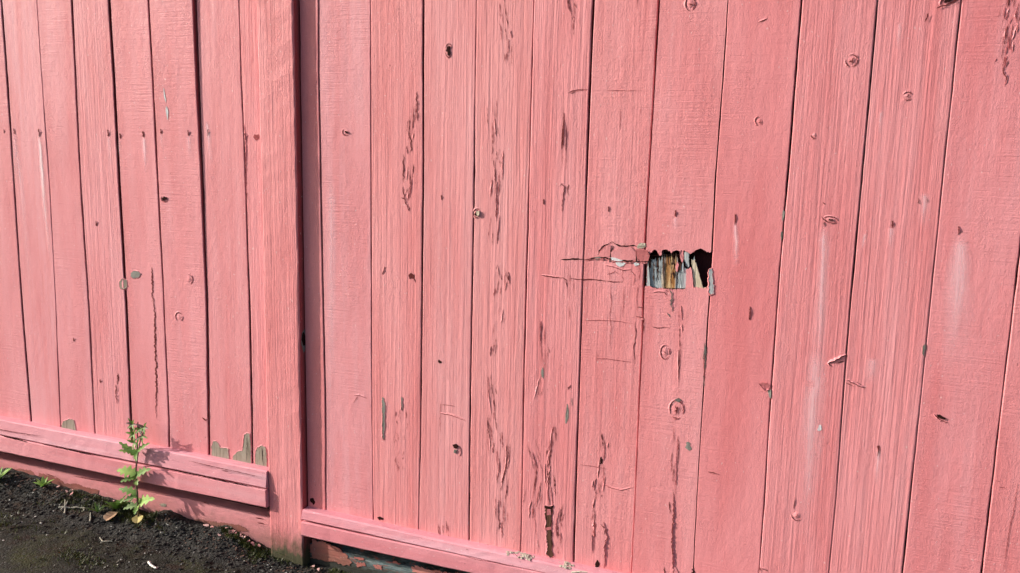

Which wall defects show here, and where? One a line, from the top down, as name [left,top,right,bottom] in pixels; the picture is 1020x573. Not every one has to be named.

crack [995,0,1020,86]
crack [402,92,420,211]
crack [560,89,641,212]
spalling [596,243,715,296]
crack [439,101,572,567]
peeling [211,432,268,467]
crack [542,264,707,573]
peeling [309,539,383,570]
peeling [393,561,448,573]